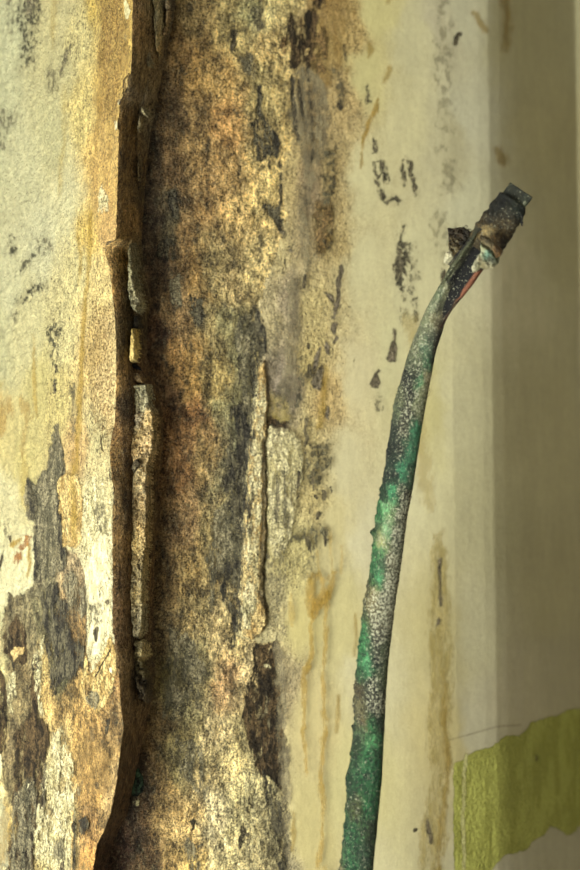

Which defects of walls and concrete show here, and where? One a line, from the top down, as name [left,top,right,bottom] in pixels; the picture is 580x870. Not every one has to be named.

mould [6,0,42,69]
water stain [229,29,287,238]
mould [372,137,418,205]
mould [10,281,48,322]
mould [19,235,52,272]
water stain [83,298,115,456]
flaking render [0,0,308,870]
water stain [206,145,344,650]
mould [392,224,419,322]
water stain [38,475,113,695]
water stain [176,737,213,803]
water stain [241,641,292,870]